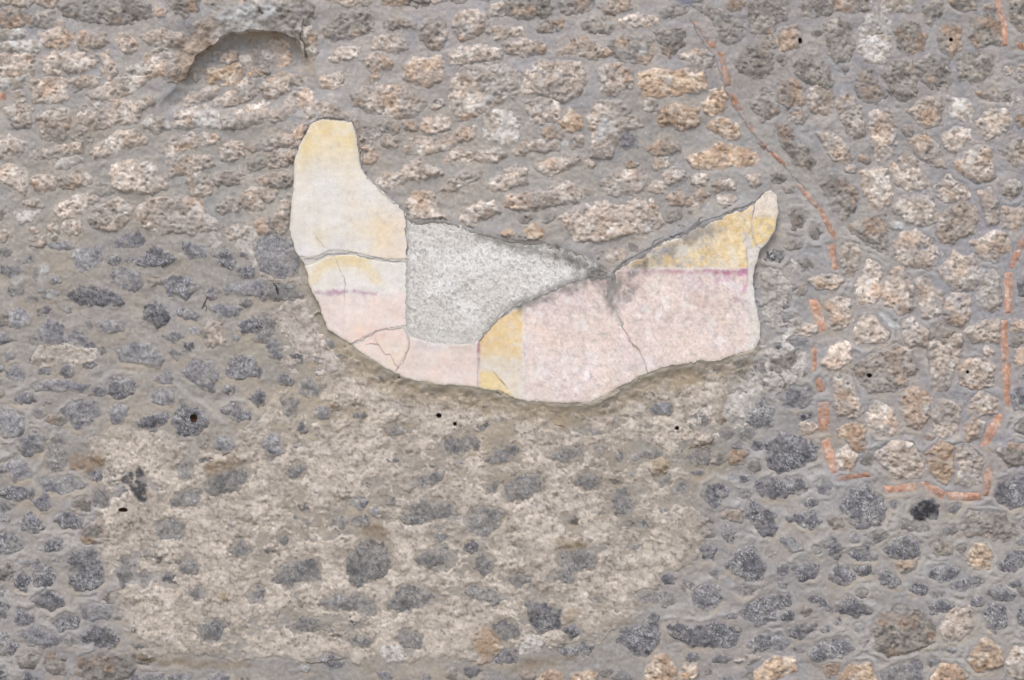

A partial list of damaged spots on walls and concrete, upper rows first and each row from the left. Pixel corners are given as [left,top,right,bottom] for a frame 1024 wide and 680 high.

crack [303,170,408,297]
crack [478,192,764,342]
crack [346,327,410,370]
crack [612,305,648,372]
flaking render [85,225,807,666]